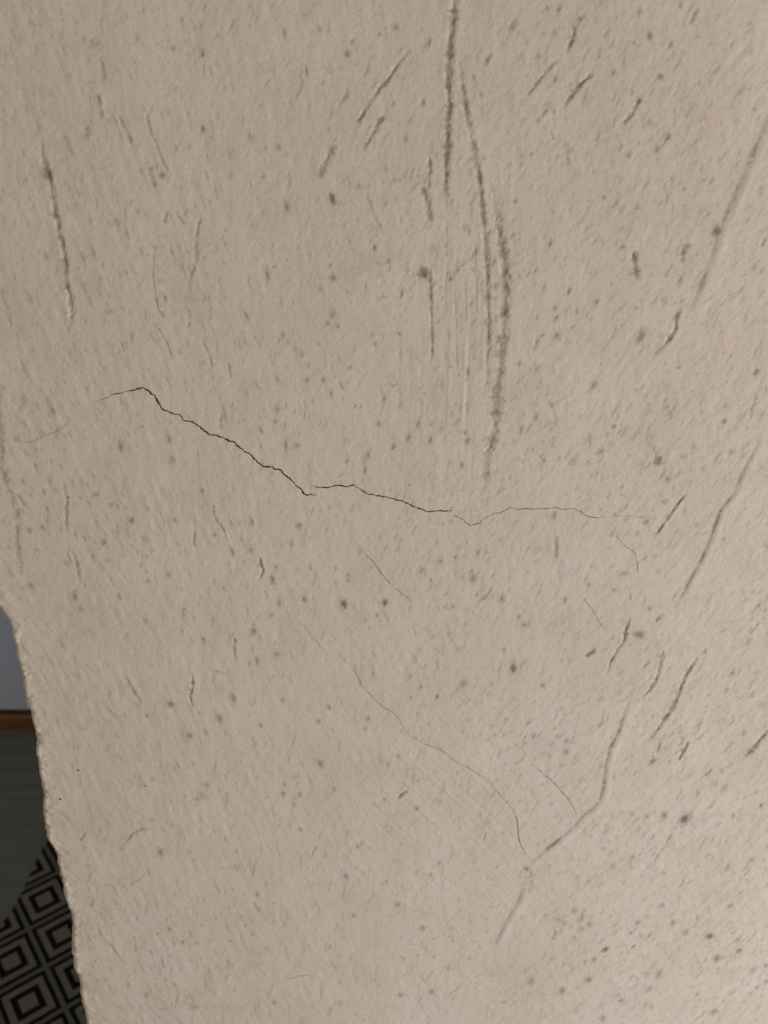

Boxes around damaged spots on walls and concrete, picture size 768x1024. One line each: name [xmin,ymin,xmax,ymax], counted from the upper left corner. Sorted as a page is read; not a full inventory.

crack [106,387,599,526]